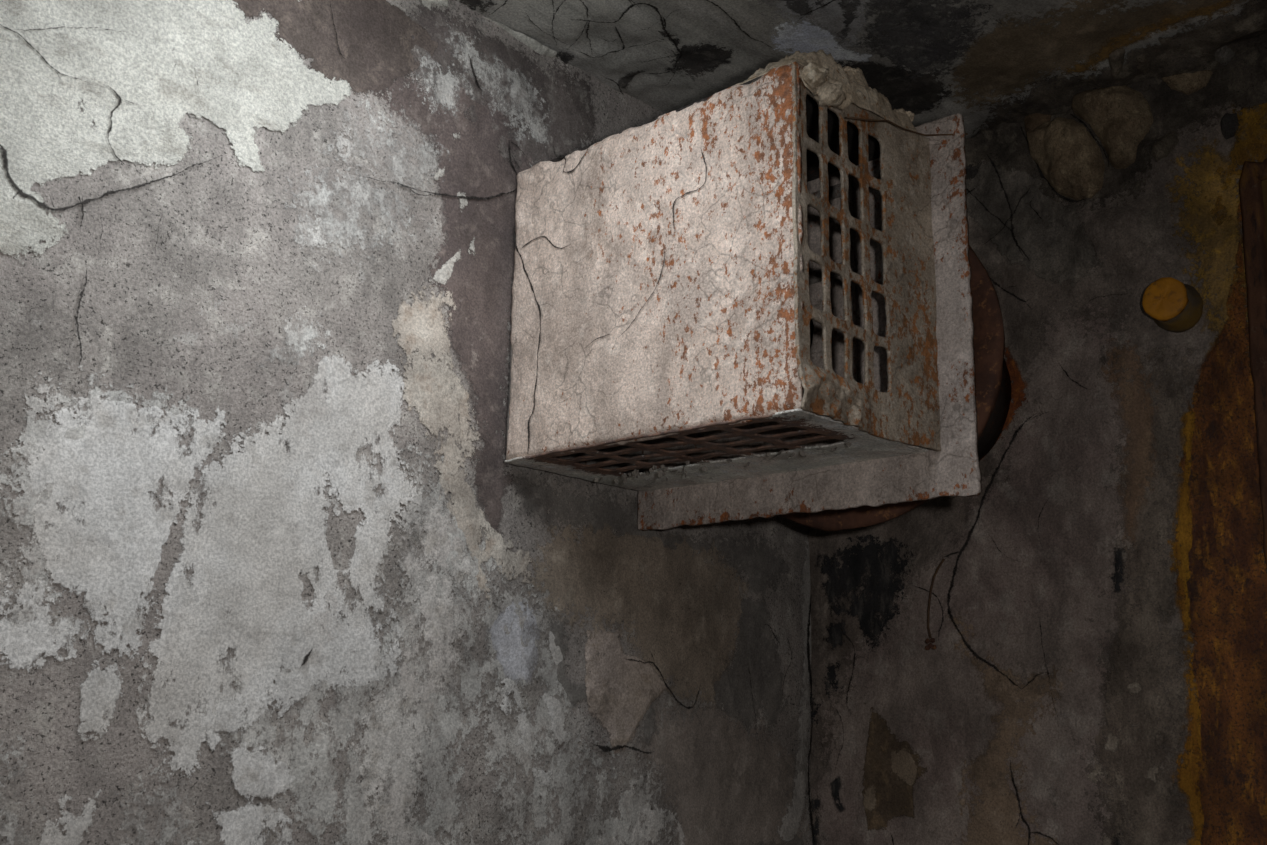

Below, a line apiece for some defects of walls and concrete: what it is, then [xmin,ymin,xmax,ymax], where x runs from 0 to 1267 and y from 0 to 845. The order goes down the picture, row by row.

crack [0,25,222,365]
crack [468,54,481,89]
crack [489,0,772,94]
corrosion [1165,103,1267,372]
water stain [377,0,845,845]
crack [765,598,856,838]
water stain [810,534,914,725]
crack [912,412,1058,717]